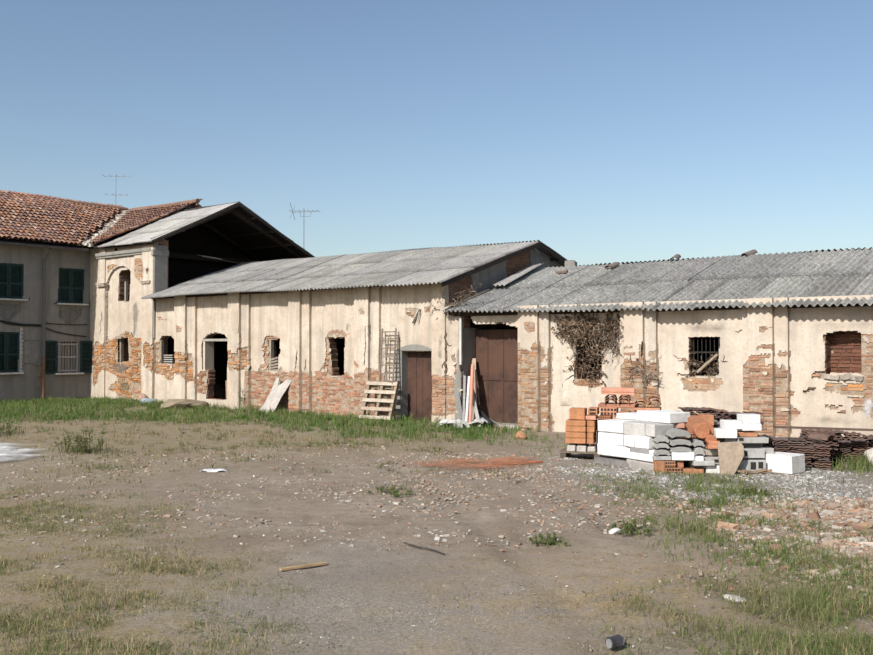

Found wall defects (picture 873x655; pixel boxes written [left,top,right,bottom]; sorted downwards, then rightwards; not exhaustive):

flaking render [92,331,208,399]
flaking render [227,329,395,418]
flaking render [518,322,554,431]
flaking render [619,343,663,412]
flaking render [674,355,723,392]
flaking render [743,334,873,437]